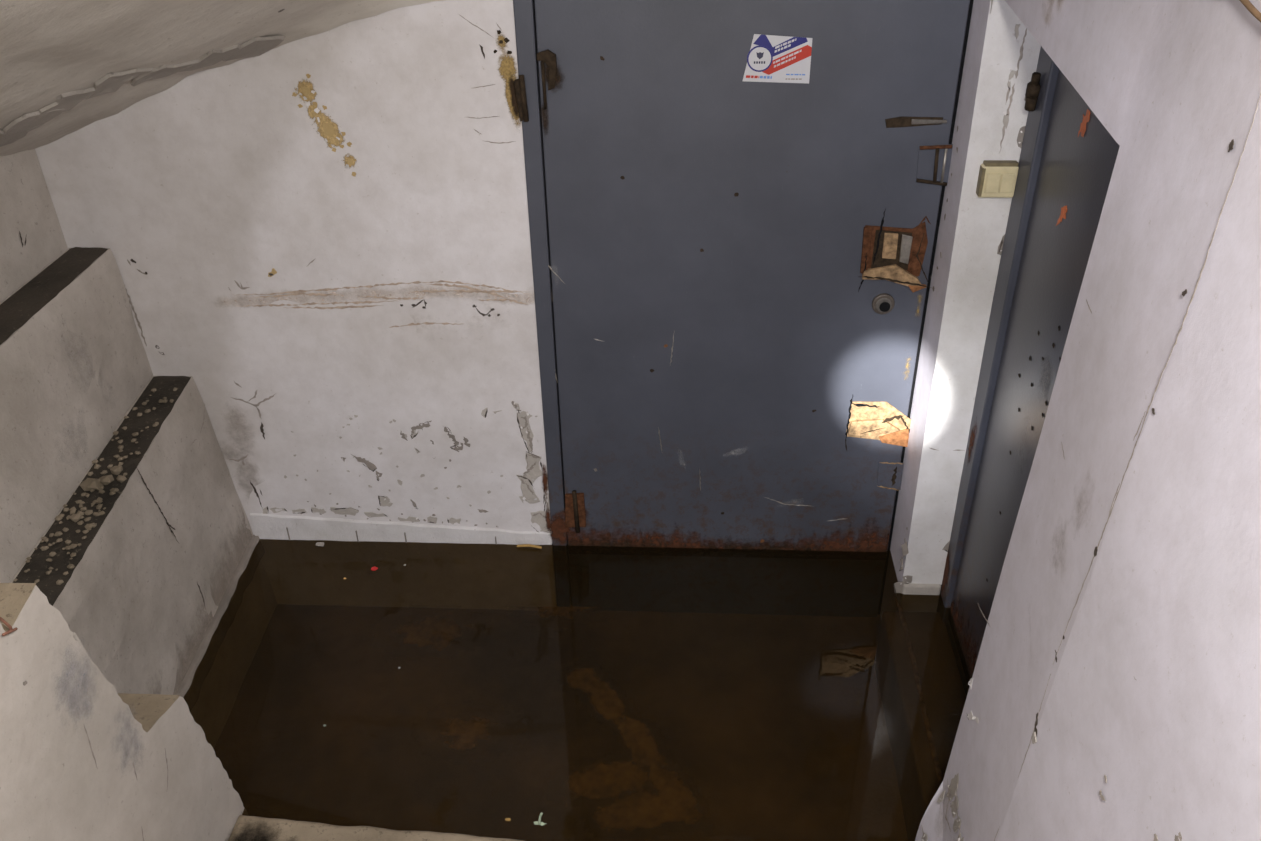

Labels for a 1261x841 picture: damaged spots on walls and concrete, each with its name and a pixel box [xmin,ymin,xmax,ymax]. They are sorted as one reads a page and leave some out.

rust [493,30,519,125]
crack [191,381,275,507]
spalling [263,447,497,527]
peeling [389,419,470,469]
spalling [481,401,552,533]
rust [545,510,890,552]
peeling [937,773,964,841]